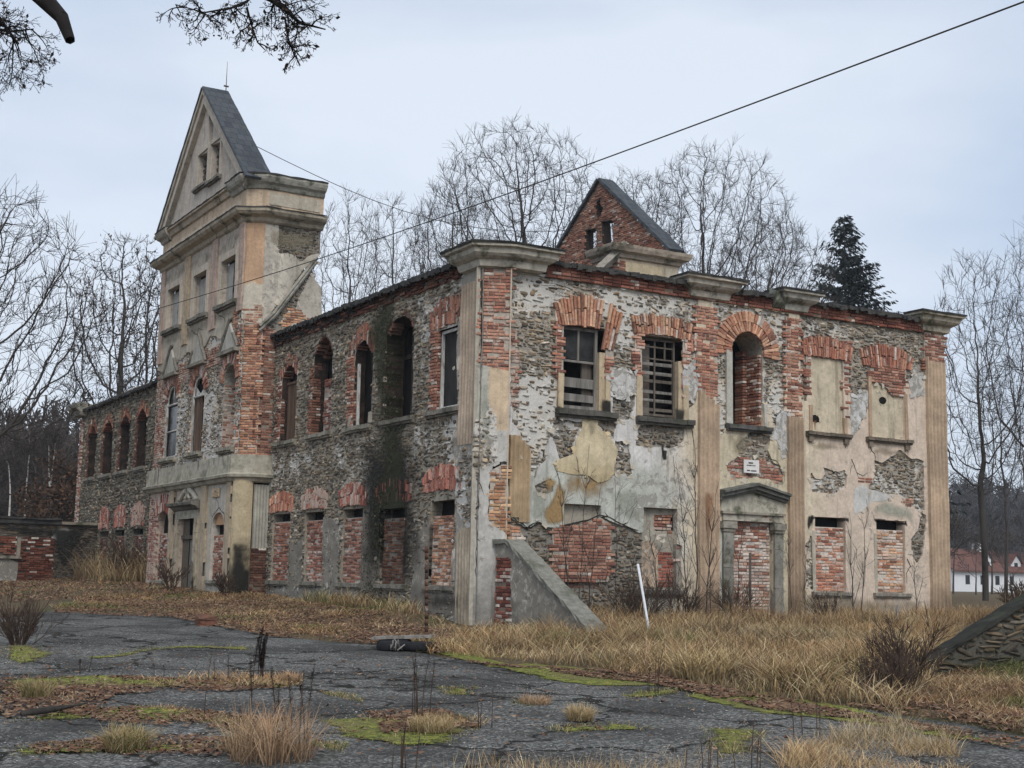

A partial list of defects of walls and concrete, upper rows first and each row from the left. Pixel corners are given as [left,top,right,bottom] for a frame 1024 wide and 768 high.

flaking render [152,225,321,470]
flaking render [410,268,948,627]